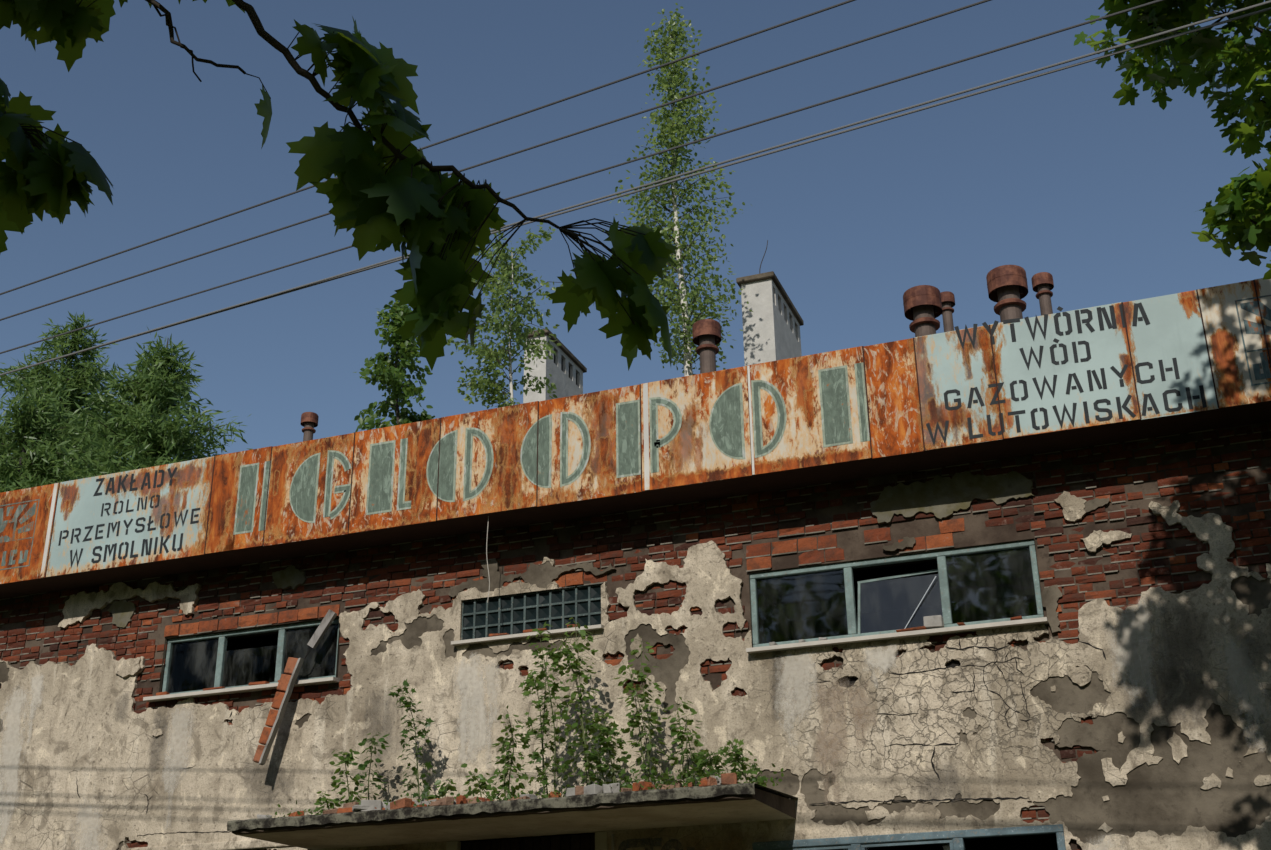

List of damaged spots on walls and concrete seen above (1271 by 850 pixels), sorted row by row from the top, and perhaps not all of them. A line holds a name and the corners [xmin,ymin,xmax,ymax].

corrosion [789,355,814,428]
corrosion [909,324,1110,451]
corrosion [1210,327,1248,407]
corrosion [0,480,80,582]
corrosion [104,423,464,556]
flaking render [0,423,1271,728]
corrosion [480,392,875,514]
flaking render [755,769,1000,826]
crack [809,713,1027,805]
crack [891,639,1031,727]
flaking render [958,707,981,743]
flaking render [1021,665,1271,850]